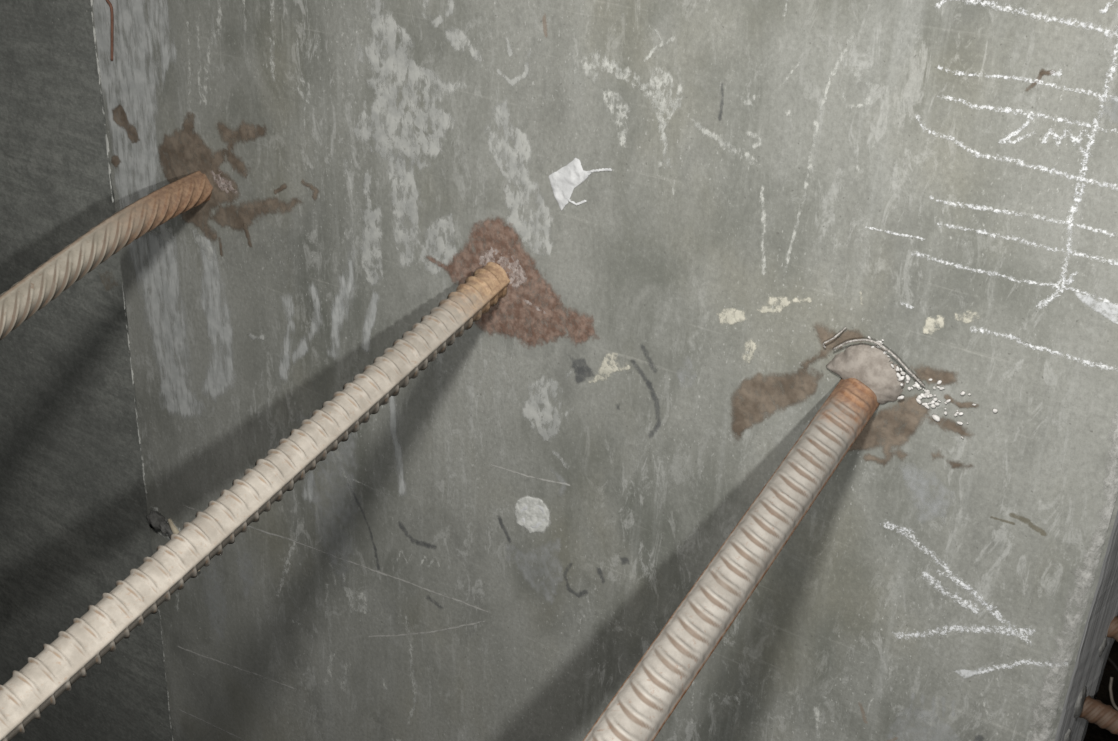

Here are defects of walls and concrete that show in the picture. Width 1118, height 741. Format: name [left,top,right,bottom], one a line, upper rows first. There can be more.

corrosion [112,105,139,143]
corrosion [159,113,318,256]
corrosion [428,218,595,347]
corrosion [732,326,863,437]
corrosion [849,396,969,464]
corrosion [915,367,978,408]